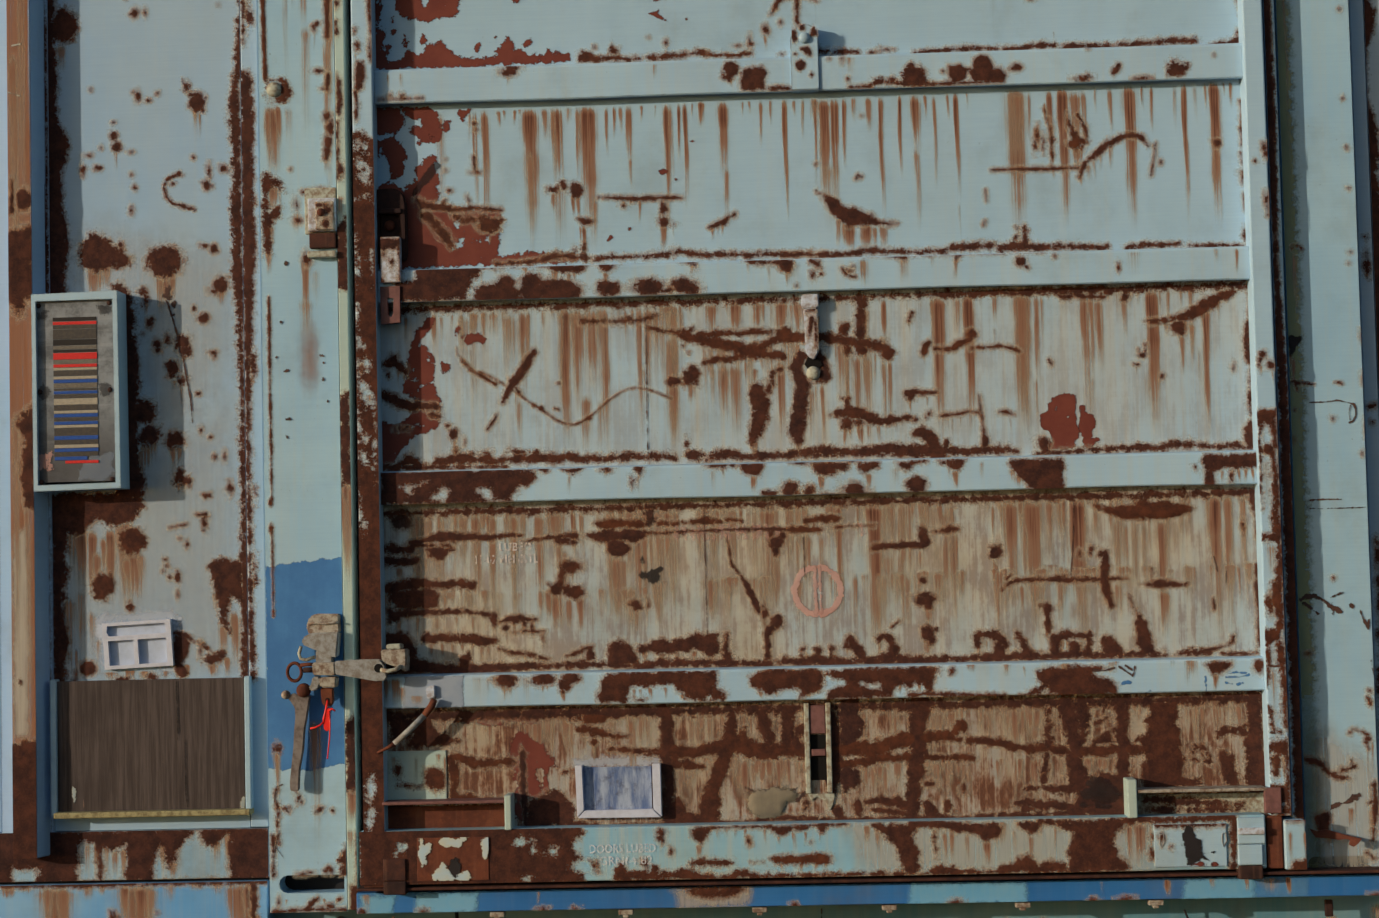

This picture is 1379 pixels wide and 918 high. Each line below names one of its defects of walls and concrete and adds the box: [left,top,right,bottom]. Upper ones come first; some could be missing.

peeling [375,0,570,70]
rust [1349,0,1379,383]
rust [198,0,322,680]
rust [270,0,1312,914]
peeling [1040,393,1100,450]
rust [1348,724,1379,756]
rust [1348,779,1379,860]